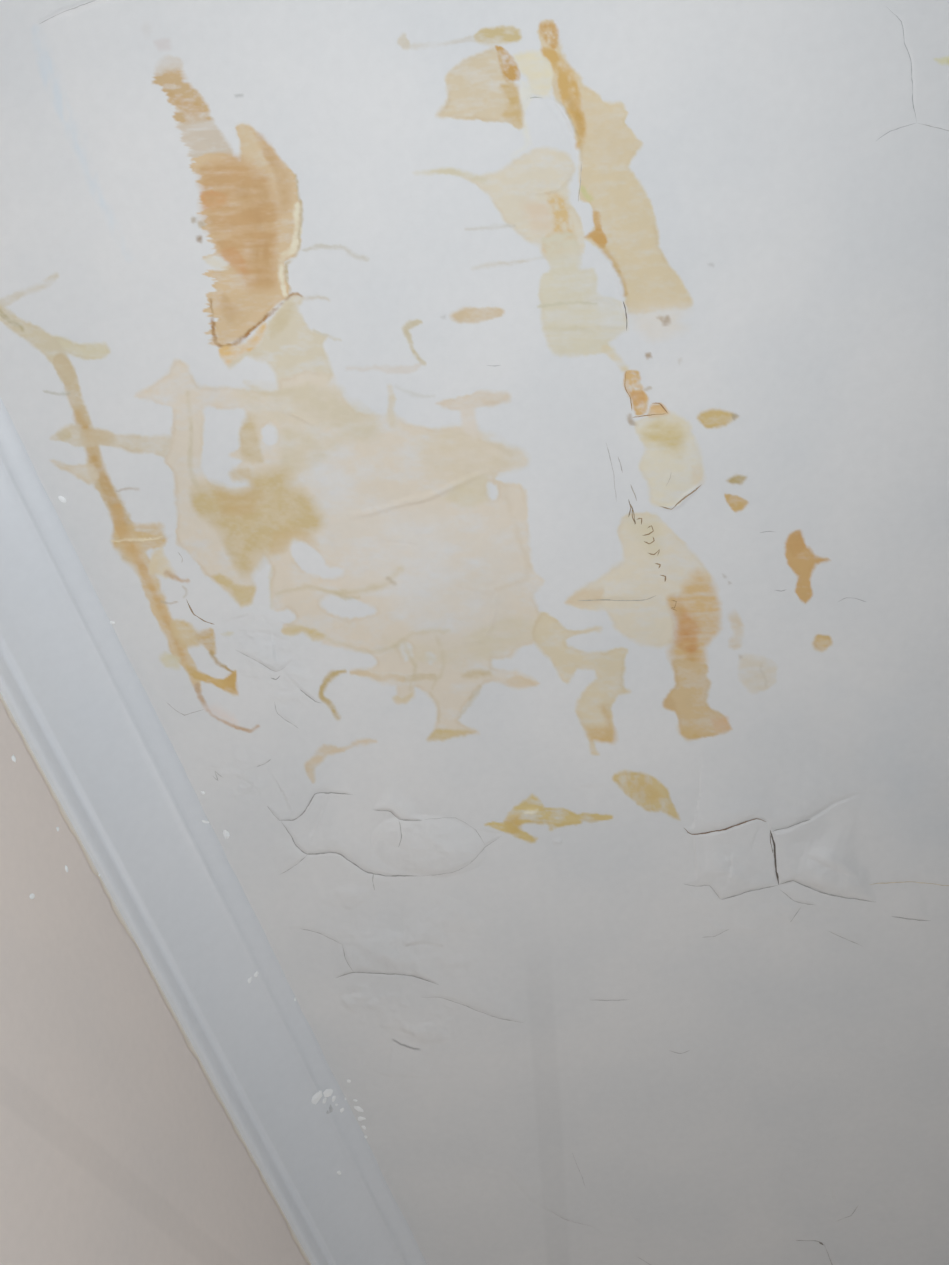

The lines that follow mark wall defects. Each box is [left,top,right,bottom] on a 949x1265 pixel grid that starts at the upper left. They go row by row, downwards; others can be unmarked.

water stain [395,17,697,361]
water stain [0,19,633,756]
water stain [695,406,741,431]
water stain [722,472,750,514]
water stain [783,528,832,605]
water stain [725,608,780,696]
water stain [810,632,834,653]
water stain [302,737,379,784]
water stain [610,768,682,823]